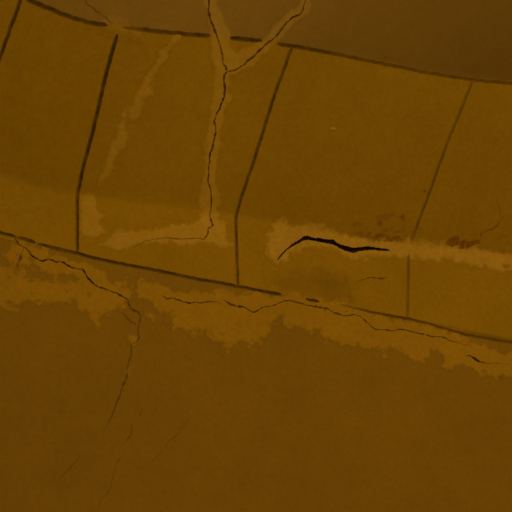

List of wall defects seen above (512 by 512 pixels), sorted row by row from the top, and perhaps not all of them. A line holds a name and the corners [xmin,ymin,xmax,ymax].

water stain [96,0,313,252]
crack [137,0,306,245]
crack [15,237,142,433]
crack [277,236,390,260]
crack [162,295,510,365]
water stain [328,230,512,275]